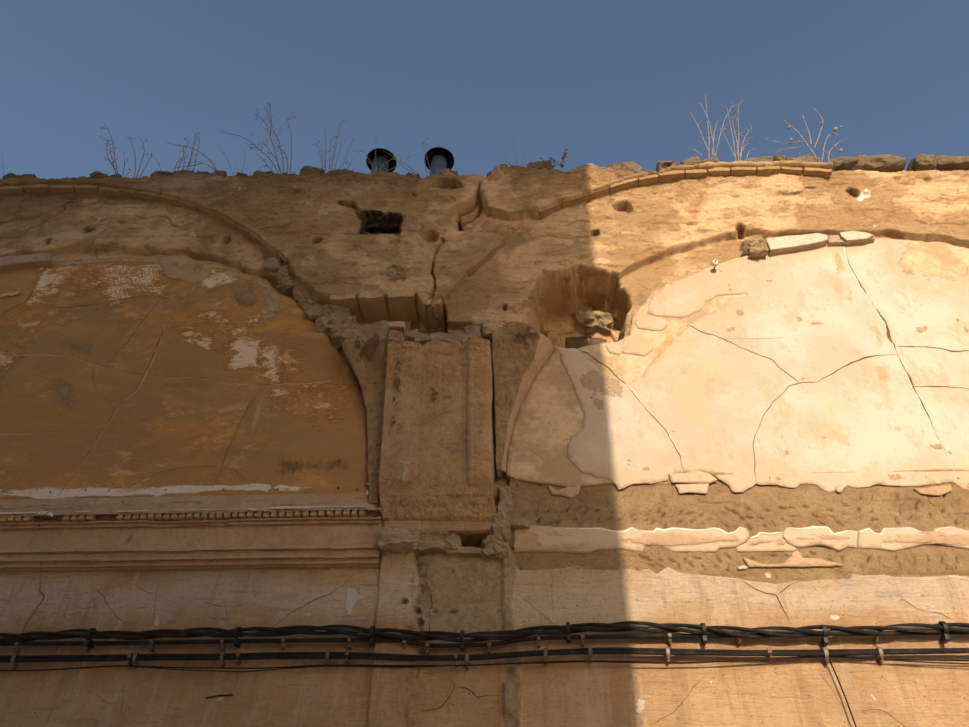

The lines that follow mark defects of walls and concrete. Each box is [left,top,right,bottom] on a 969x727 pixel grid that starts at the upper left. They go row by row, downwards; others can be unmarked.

peeling [54,255,285,320]
crack [0,269,332,495]
crack [579,349,685,471]
crack [673,246,969,483]
flaking render [669,471,717,494]
flaking render [914,484,952,496]
flaking render [512,525,969,579]